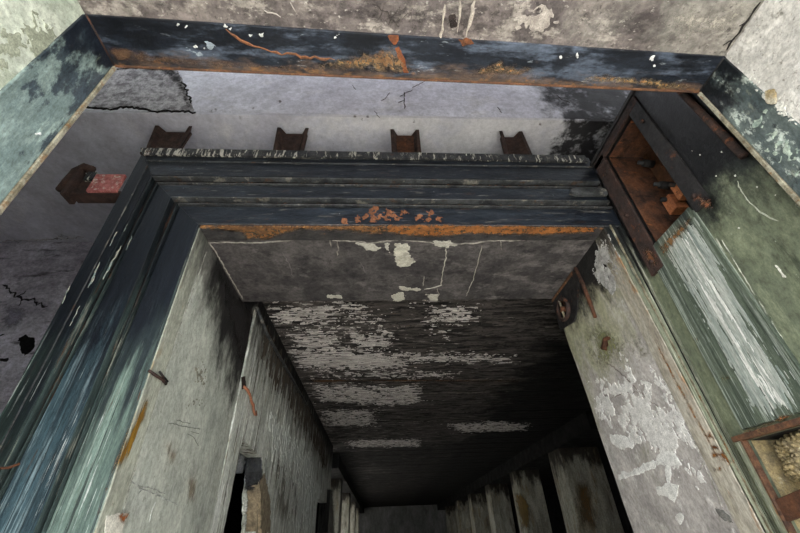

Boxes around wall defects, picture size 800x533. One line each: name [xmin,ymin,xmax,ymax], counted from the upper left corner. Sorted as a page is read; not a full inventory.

rust [226,29,409,73]
spalling [88,68,194,112]
peeling [355,242,416,267]
rust [211,206,596,239]
peeling [433,240,457,248]
peeling [592,234,620,295]
crack [3,285,47,308]
peeling [391,286,481,341]
spalling [18,334,35,356]
peeling [246,295,517,533]
peeling [447,420,532,434]
peeling [588,352,707,503]